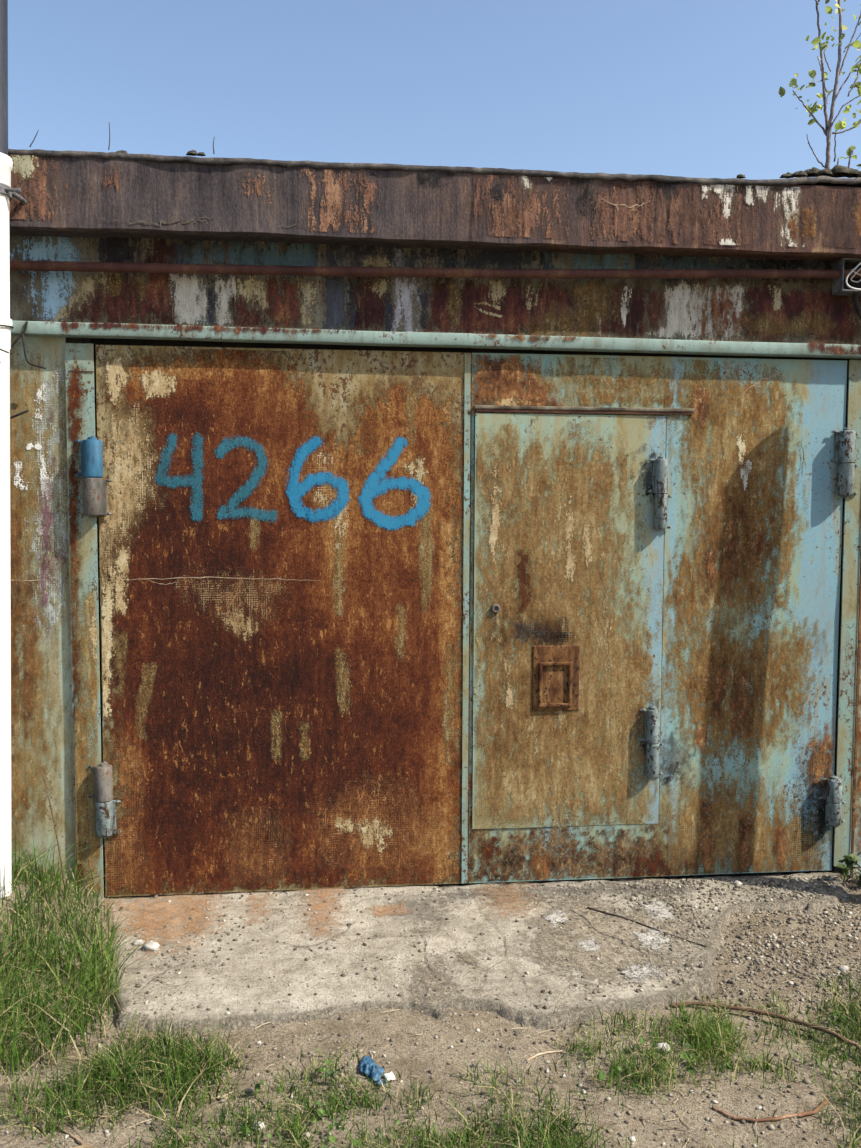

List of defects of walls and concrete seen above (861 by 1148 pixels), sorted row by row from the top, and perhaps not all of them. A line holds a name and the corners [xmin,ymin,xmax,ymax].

corrosion [9,155,73,221]
corrosion [298,169,381,233]
corrosion [466,175,758,245]
corrosion [795,188,861,248]
peeling [10,236,88,322]
corrosion [60,238,393,335]
peeling [169,274,317,329]
corrosion [421,278,648,342]
peeling [641,267,759,341]
corrosion [737,281,861,355]
peeling [736,434,752,490]
corrosion [10,342,834,959]